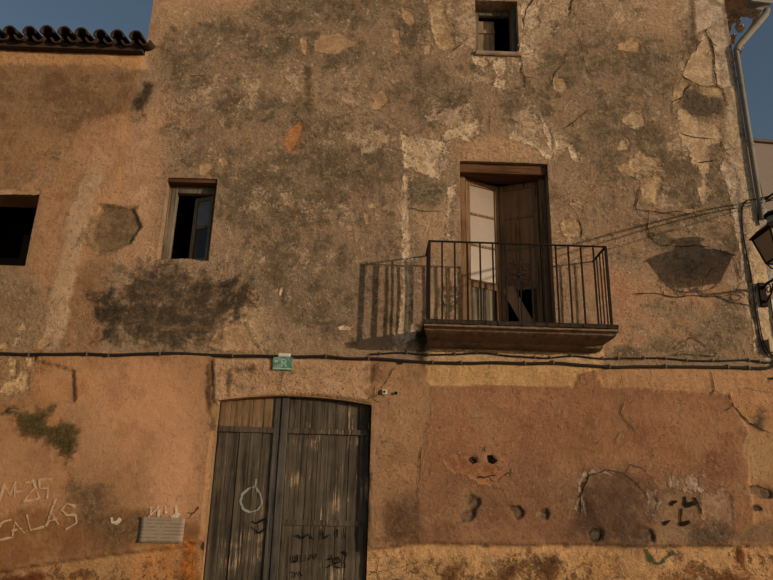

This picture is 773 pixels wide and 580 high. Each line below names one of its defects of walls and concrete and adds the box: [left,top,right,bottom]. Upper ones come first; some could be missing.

peeling [471,54,510,90]
peeling [517,0,553,58]
peeling [506,113,582,164]
crack [672,27,734,163]
peeling [671,0,763,353]
peeling [388,117,483,352]
crack [632,183,748,315]
mould [86,259,256,351]
peeling [0,337,52,397]
crack [673,337,772,443]
peeling [443,448,514,524]
peeling [666,473,737,538]